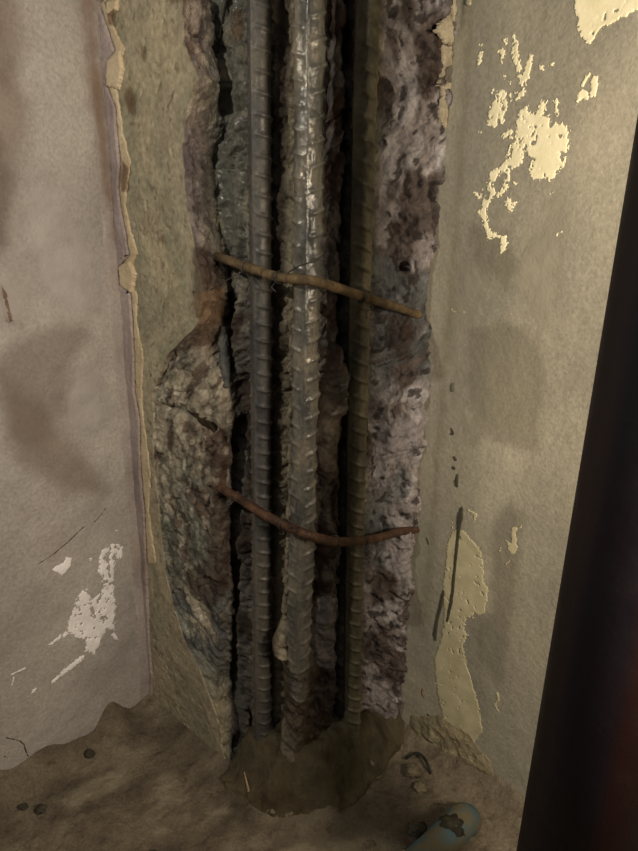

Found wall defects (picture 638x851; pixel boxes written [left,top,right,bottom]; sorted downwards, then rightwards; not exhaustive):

peeling [473,34,571,254]
peeling [576,72,598,103]
peeling [574,0,638,44]
spalling [48,0,253,760]
spalling [270,0,355,764]
spalling [361,0,457,719]
peeling [409,522,494,776]